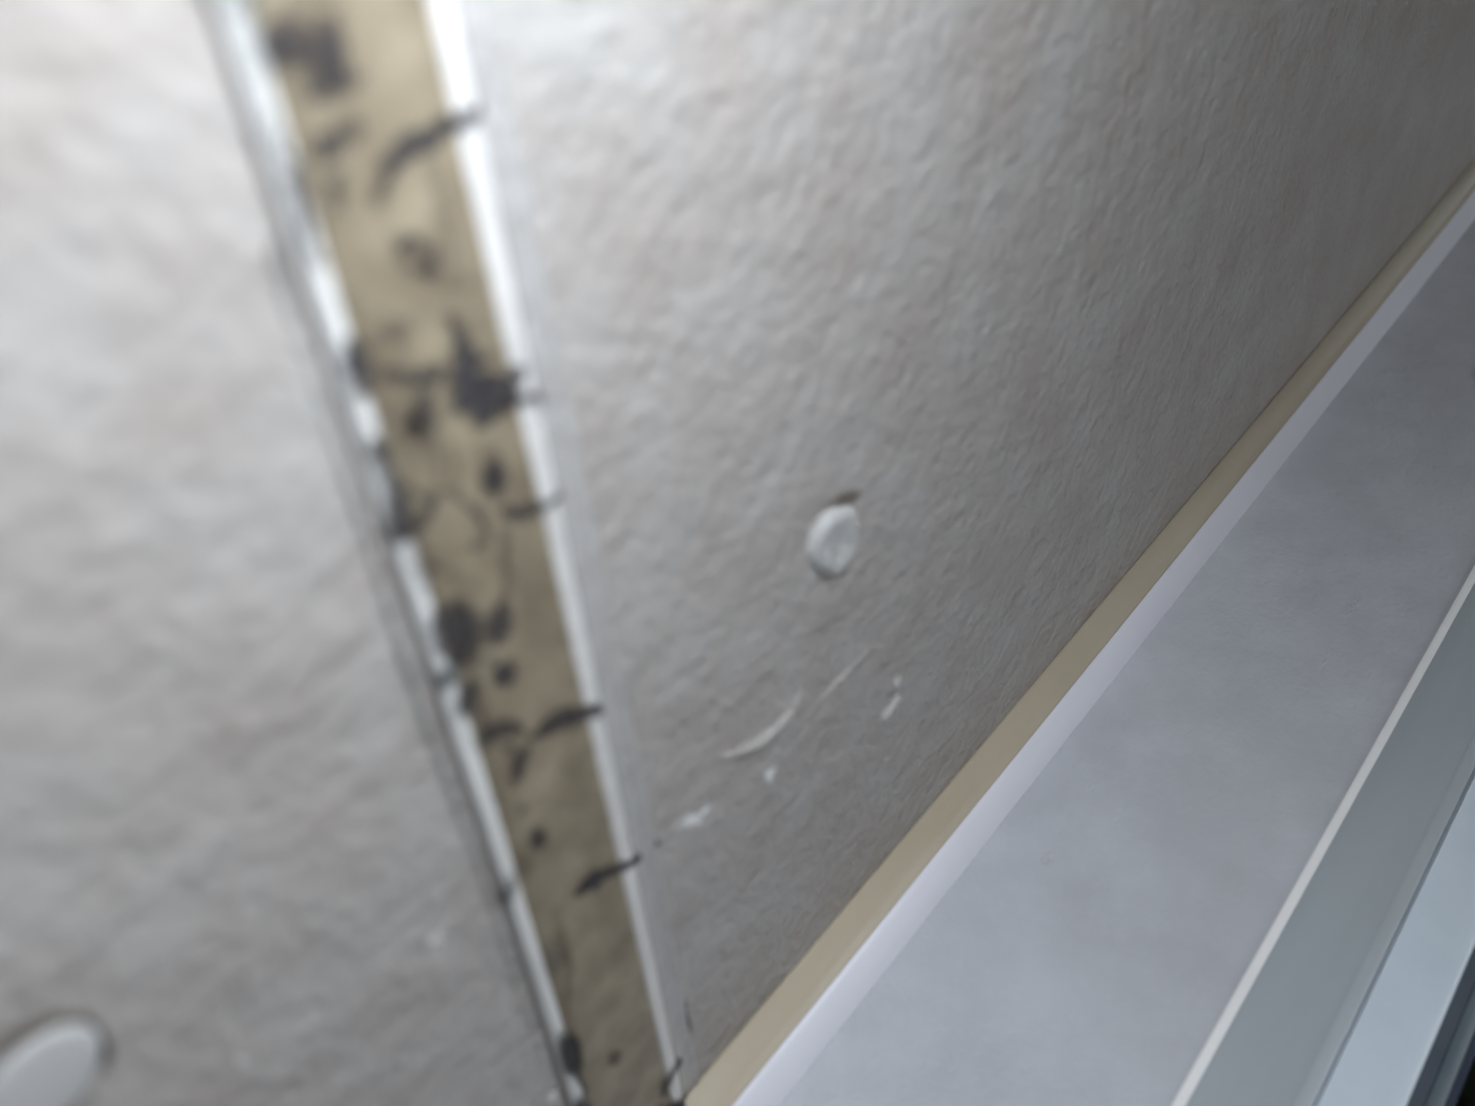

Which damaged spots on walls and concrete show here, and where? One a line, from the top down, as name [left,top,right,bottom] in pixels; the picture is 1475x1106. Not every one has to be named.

water stain [278,122,358,261]
water stain [376,103,483,200]
water stain [379,314,556,443]
water stain [371,438,603,785]
water stain [575,841,658,896]
water stain [662,1058,687,1106]